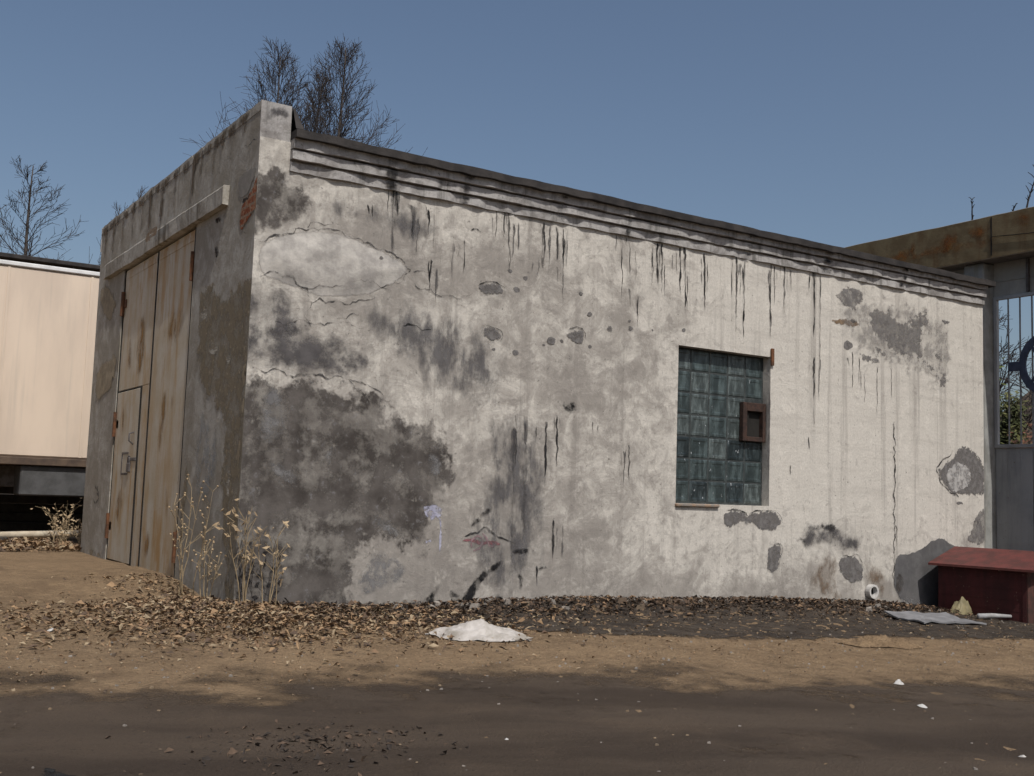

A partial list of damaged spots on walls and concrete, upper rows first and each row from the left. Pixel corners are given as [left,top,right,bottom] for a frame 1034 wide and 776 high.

spalling [238,168,257,230]
crack [264,222,468,331]
spalling [832,287,948,387]
crack [261,368,383,401]
flaking render [197,279,251,600]
water stain [234,294,455,607]
spalling [936,446,984,505]
spalling [724,508,783,531]
spalling [968,509,985,545]
spalling [767,543,783,572]
spalling [839,555,865,583]